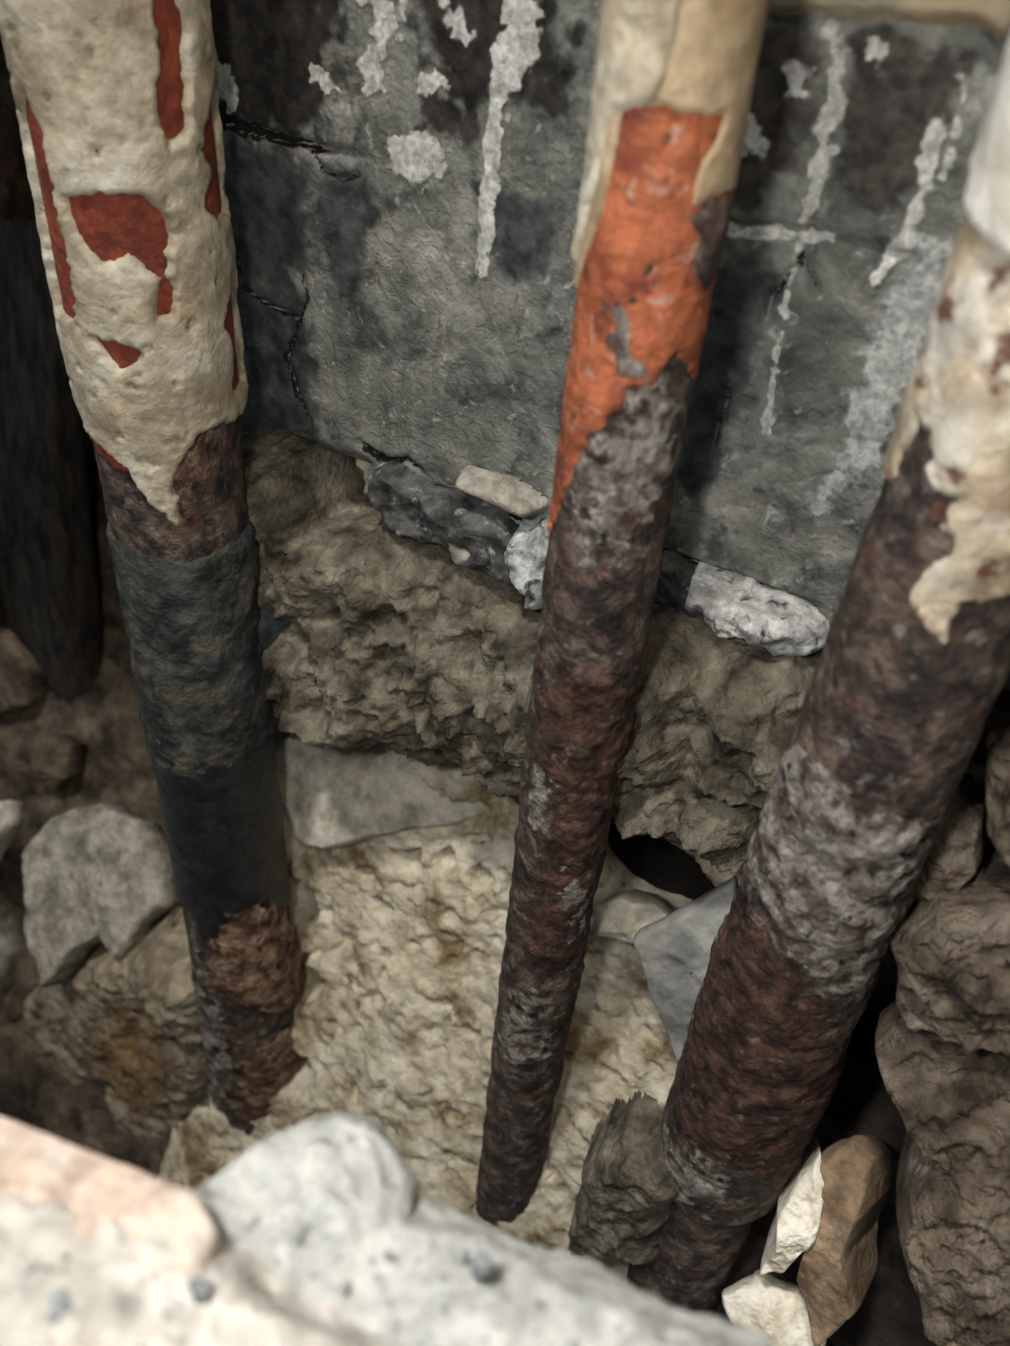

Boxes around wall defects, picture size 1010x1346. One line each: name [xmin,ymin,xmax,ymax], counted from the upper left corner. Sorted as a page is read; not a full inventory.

leakage [407,0,586,144]
leakage [732,17,820,214]
leakage [836,25,976,210]
leakage [472,181,556,279]
leakage [677,237,804,495]
leakage [811,231,955,524]
rust [171,428,214,530]